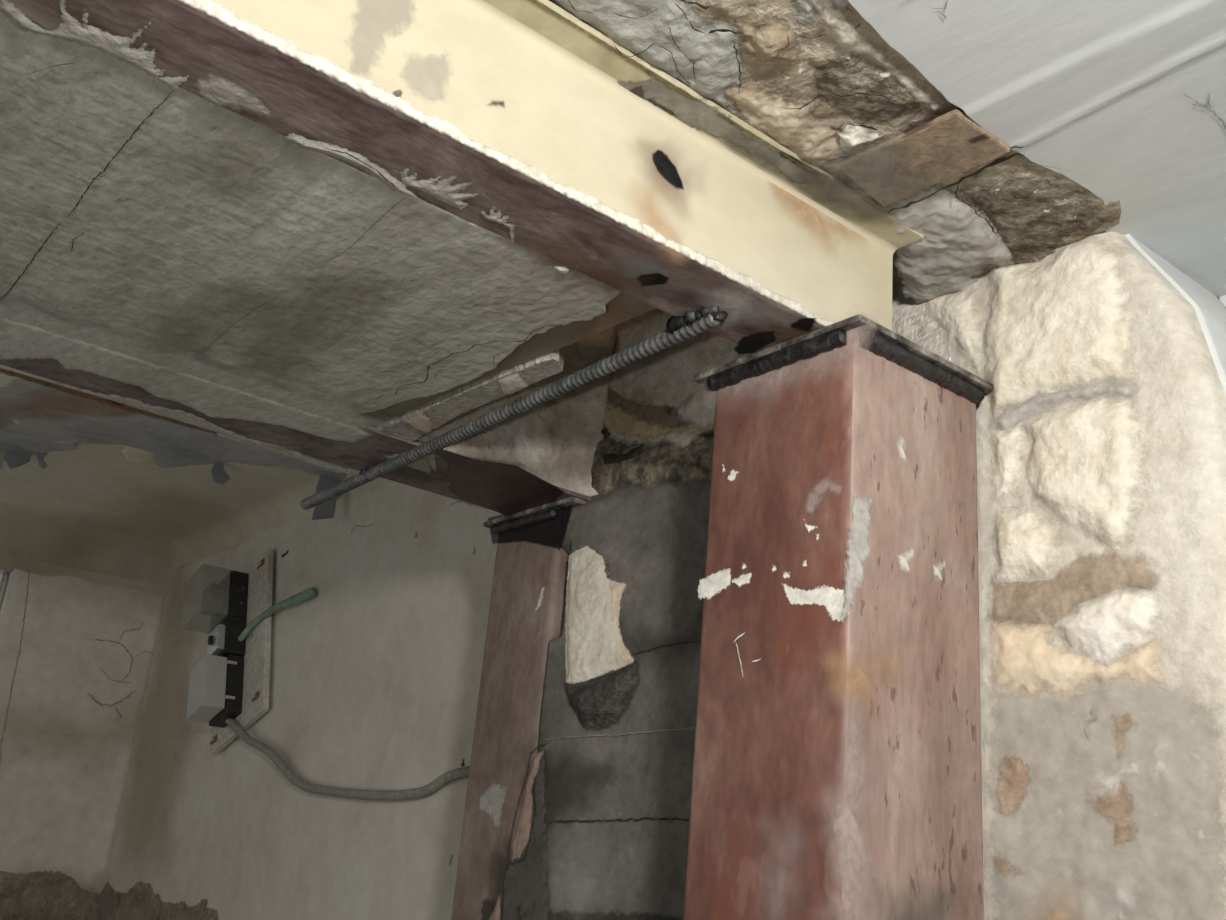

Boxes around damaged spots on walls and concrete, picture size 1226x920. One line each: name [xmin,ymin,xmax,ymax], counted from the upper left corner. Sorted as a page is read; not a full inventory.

crack [568,0,741,94]
flaking render [618,0,941,184]
crack [0,90,174,301]
peeling [0,364,348,520]
crack [87,622,154,721]
spalling [565,546,634,685]
peeling [697,564,752,600]
peeling [772,494,872,622]
peeling [507,743,549,864]
crack [550,816,690,824]
peeling [836,724,865,920]
peeling [489,895,503,920]